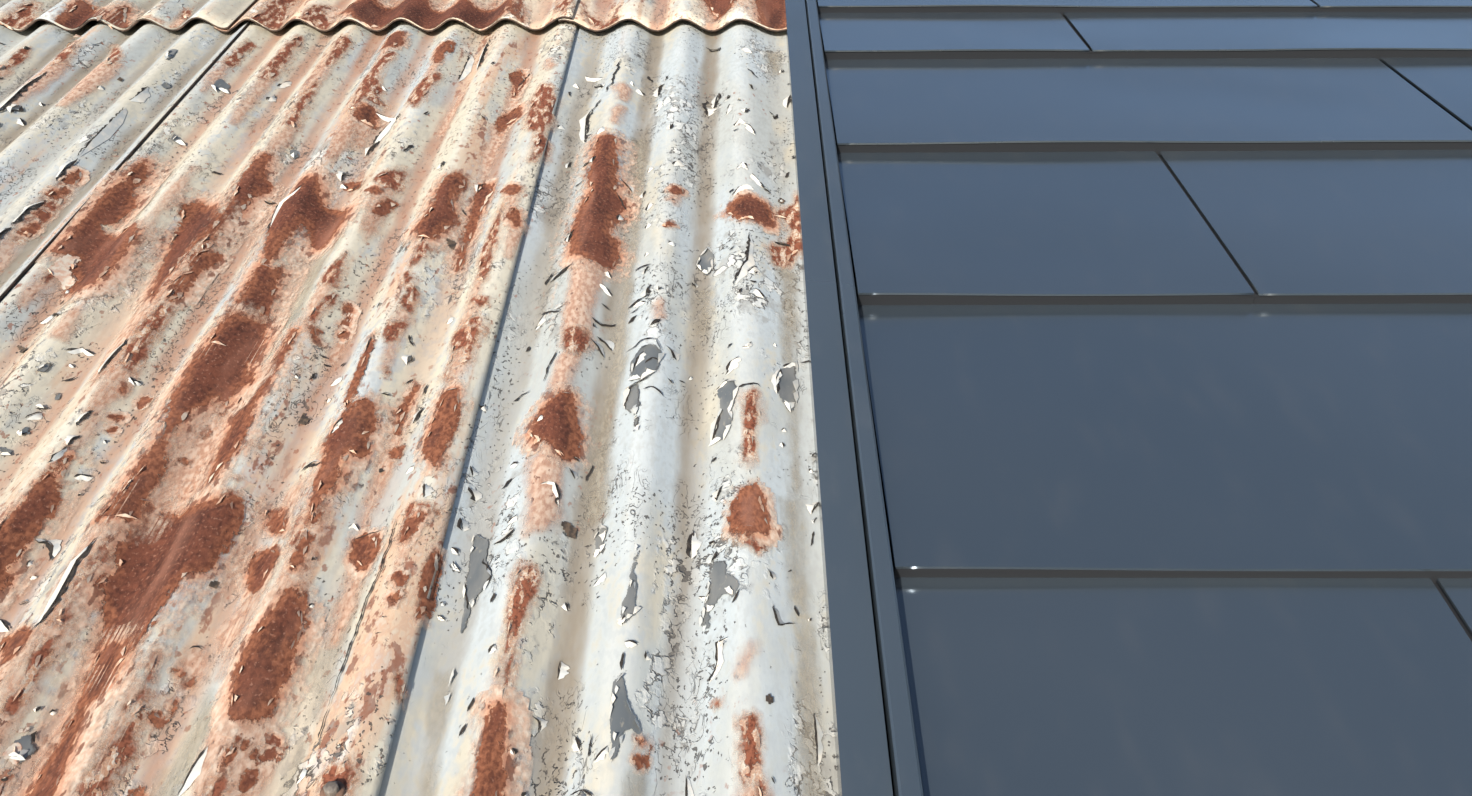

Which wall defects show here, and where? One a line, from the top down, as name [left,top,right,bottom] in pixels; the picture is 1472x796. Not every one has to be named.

rust [700,0,787,28]
rust [720,189,801,268]
rust [512,83,641,530]
rust [0,0,559,796]
peeling [623,337,680,430]
peeling [709,357,741,446]
peeling [771,359,799,412]
rust [722,382,783,555]
peeling [621,545,641,623]
peeling [699,552,740,630]
peeling [609,673,653,771]
rust [735,712,767,796]